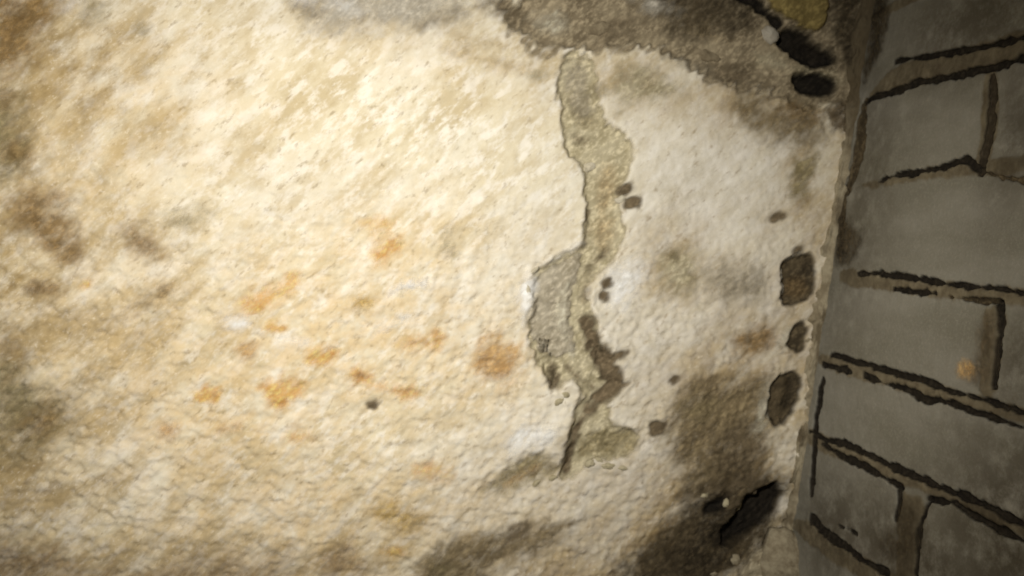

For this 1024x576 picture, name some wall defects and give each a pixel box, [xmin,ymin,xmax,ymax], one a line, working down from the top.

leakage [736,98,852,143]
crack [840,35,1024,223]
flaking render [484,0,862,490]
rust [195,388,220,402]
rust [265,382,301,405]
rust [475,336,517,374]
leakage [630,377,783,576]
crack [809,270,1024,576]